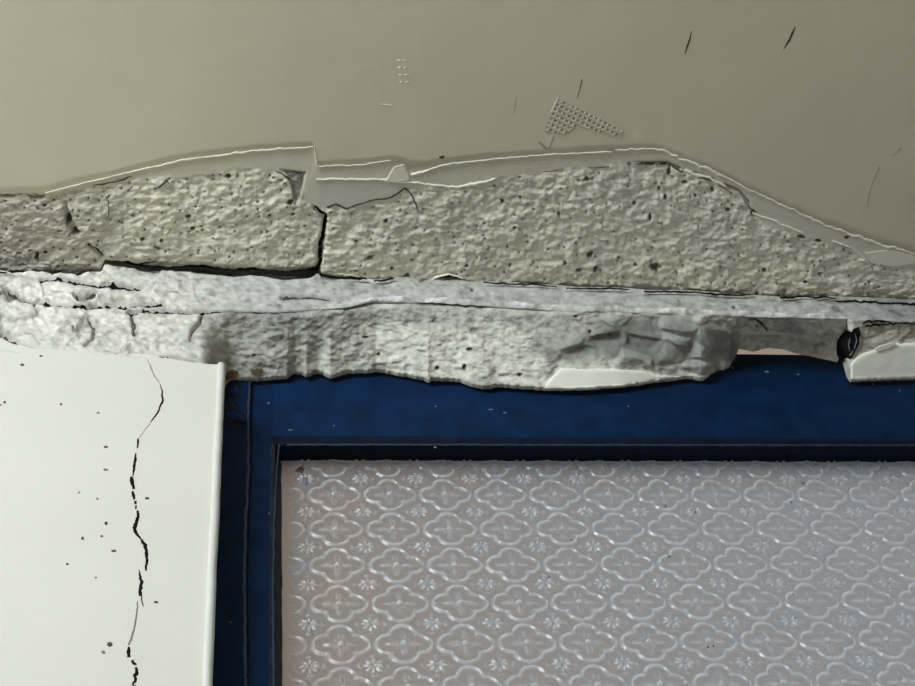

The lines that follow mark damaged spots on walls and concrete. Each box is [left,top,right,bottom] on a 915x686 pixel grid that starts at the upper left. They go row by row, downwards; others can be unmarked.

crack [0,188,419,347]
crack [415,300,486,308]
spalling [0,136,915,427]
crack [483,282,751,296]
crack [127,357,168,686]